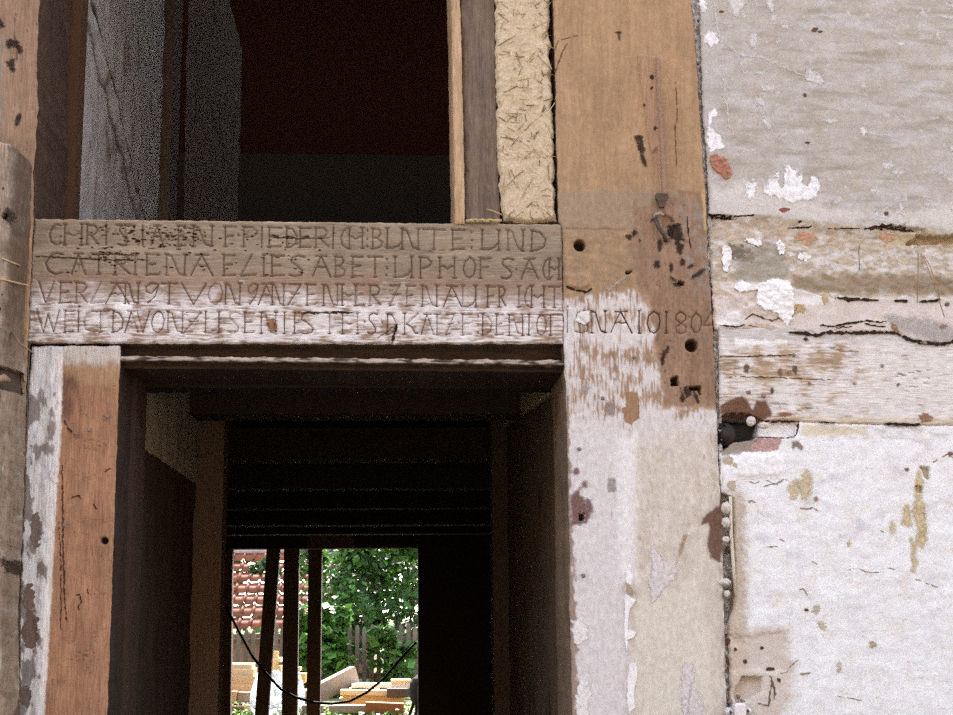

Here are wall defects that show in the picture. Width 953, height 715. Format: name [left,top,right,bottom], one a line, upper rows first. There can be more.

peeling [706,108,732,179]
peeling [745,165,820,212]
peeling [868,201,909,243]
peeling [721,237,762,272]
flaking render [776,232,835,262]
peeling [734,278,806,326]
crack [720,296,953,380]
peeling [621,391,640,425]
flaking render [751,437,781,452]
peeling [570,620,588,645]
peeling [624,566,637,714]
peeling [575,678,591,715]